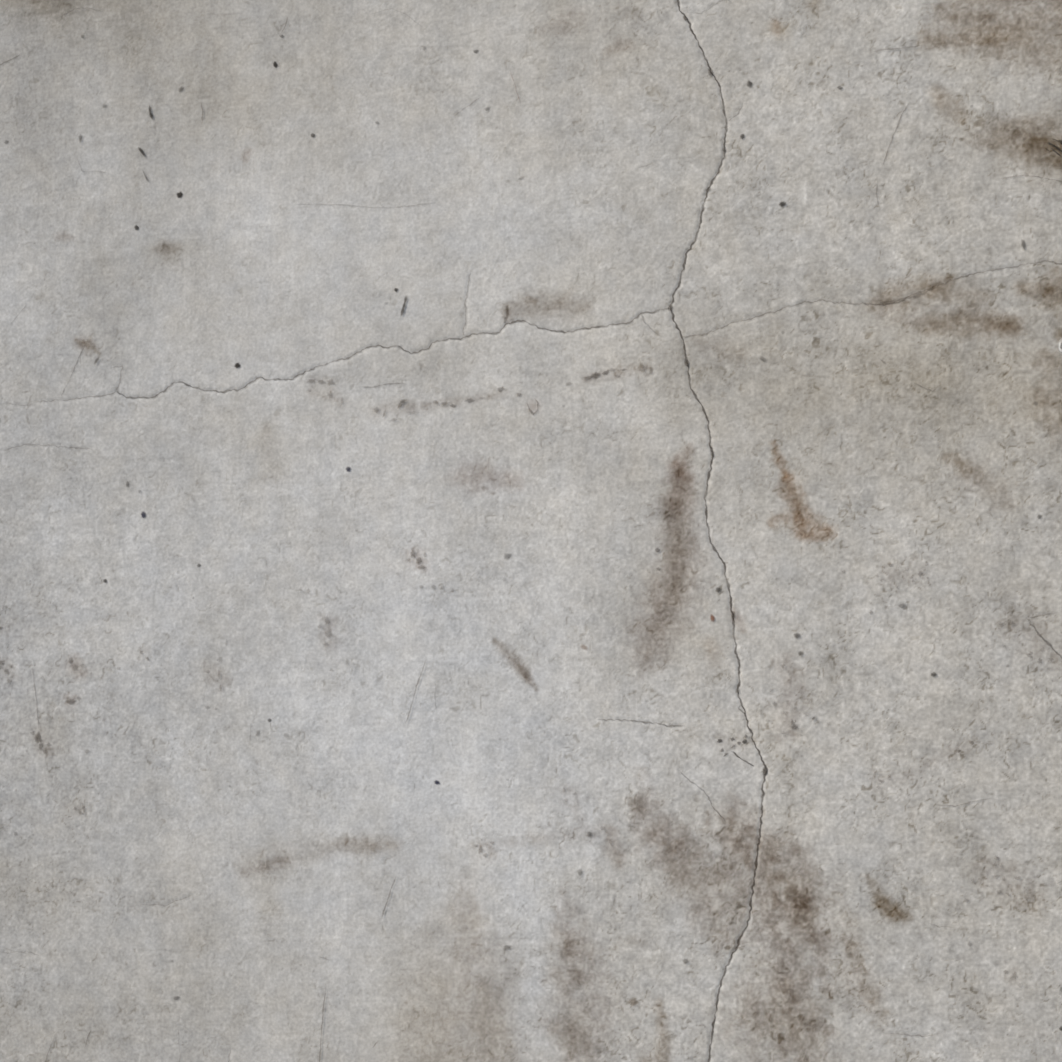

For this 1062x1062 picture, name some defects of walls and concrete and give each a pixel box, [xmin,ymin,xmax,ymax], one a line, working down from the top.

crack [459,0,734,621]
crack [708,647,767,1062]